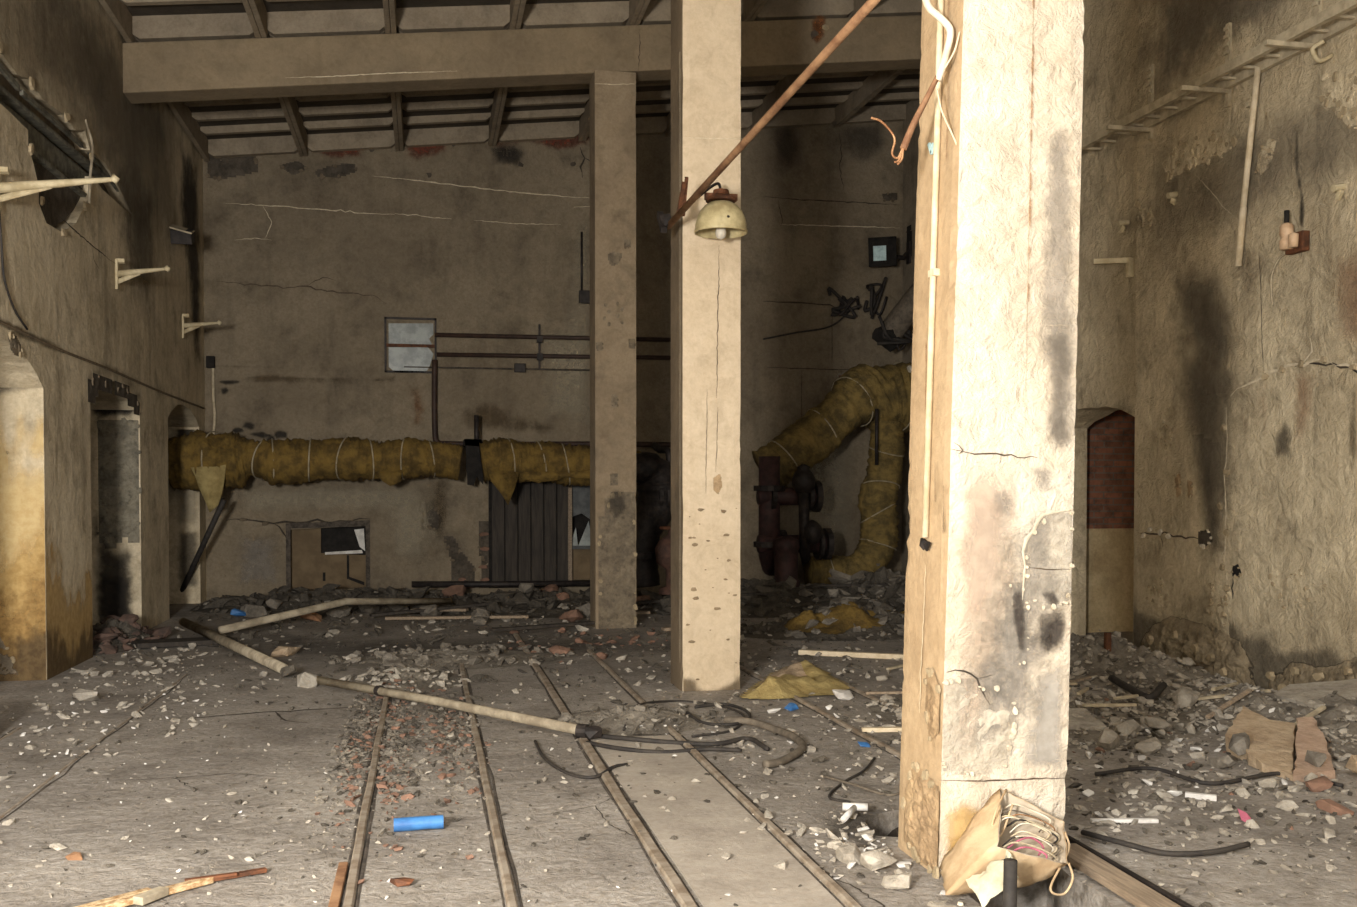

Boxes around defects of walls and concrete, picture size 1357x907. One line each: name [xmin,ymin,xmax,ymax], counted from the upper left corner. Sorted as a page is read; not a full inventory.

flaking render [0,41,119,237]
flaking render [1315,64,1357,141]
leakage [34,428,44,450]
peeling [88,373,142,549]
leakage [1189,363,1223,536]
leakage [0,445,128,681]
leakage [1013,594,1024,648]
leakage [1043,620,1063,645]